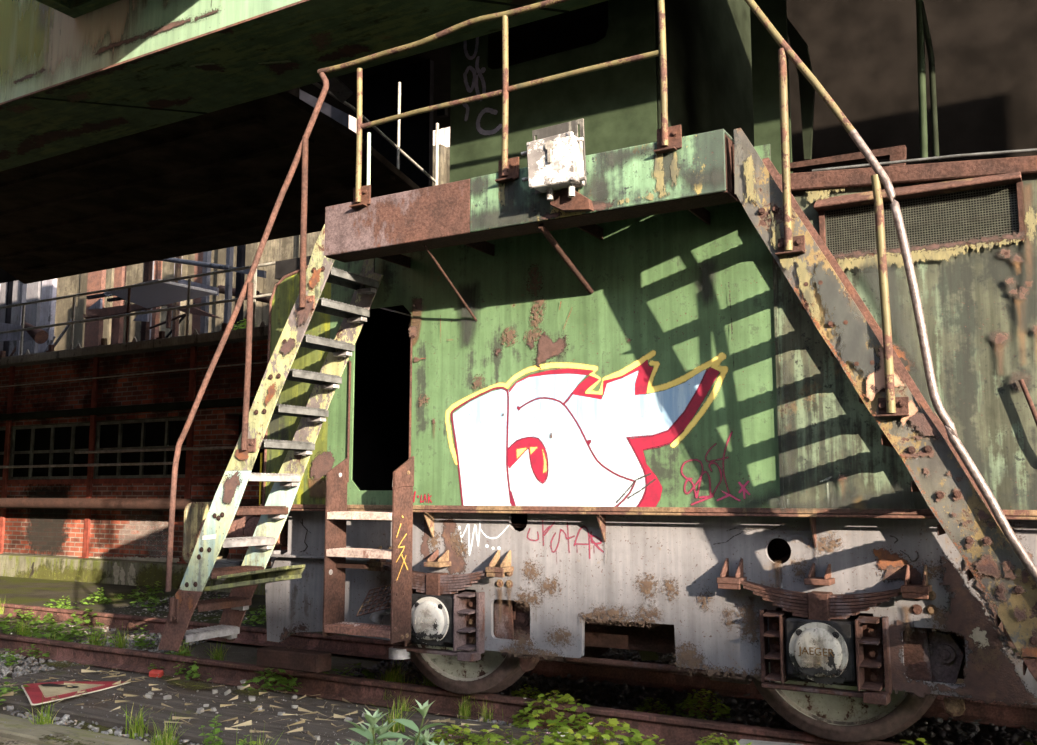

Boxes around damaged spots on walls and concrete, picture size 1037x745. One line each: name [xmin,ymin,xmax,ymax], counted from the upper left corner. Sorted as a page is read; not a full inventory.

corrosion [0,0,310,106]